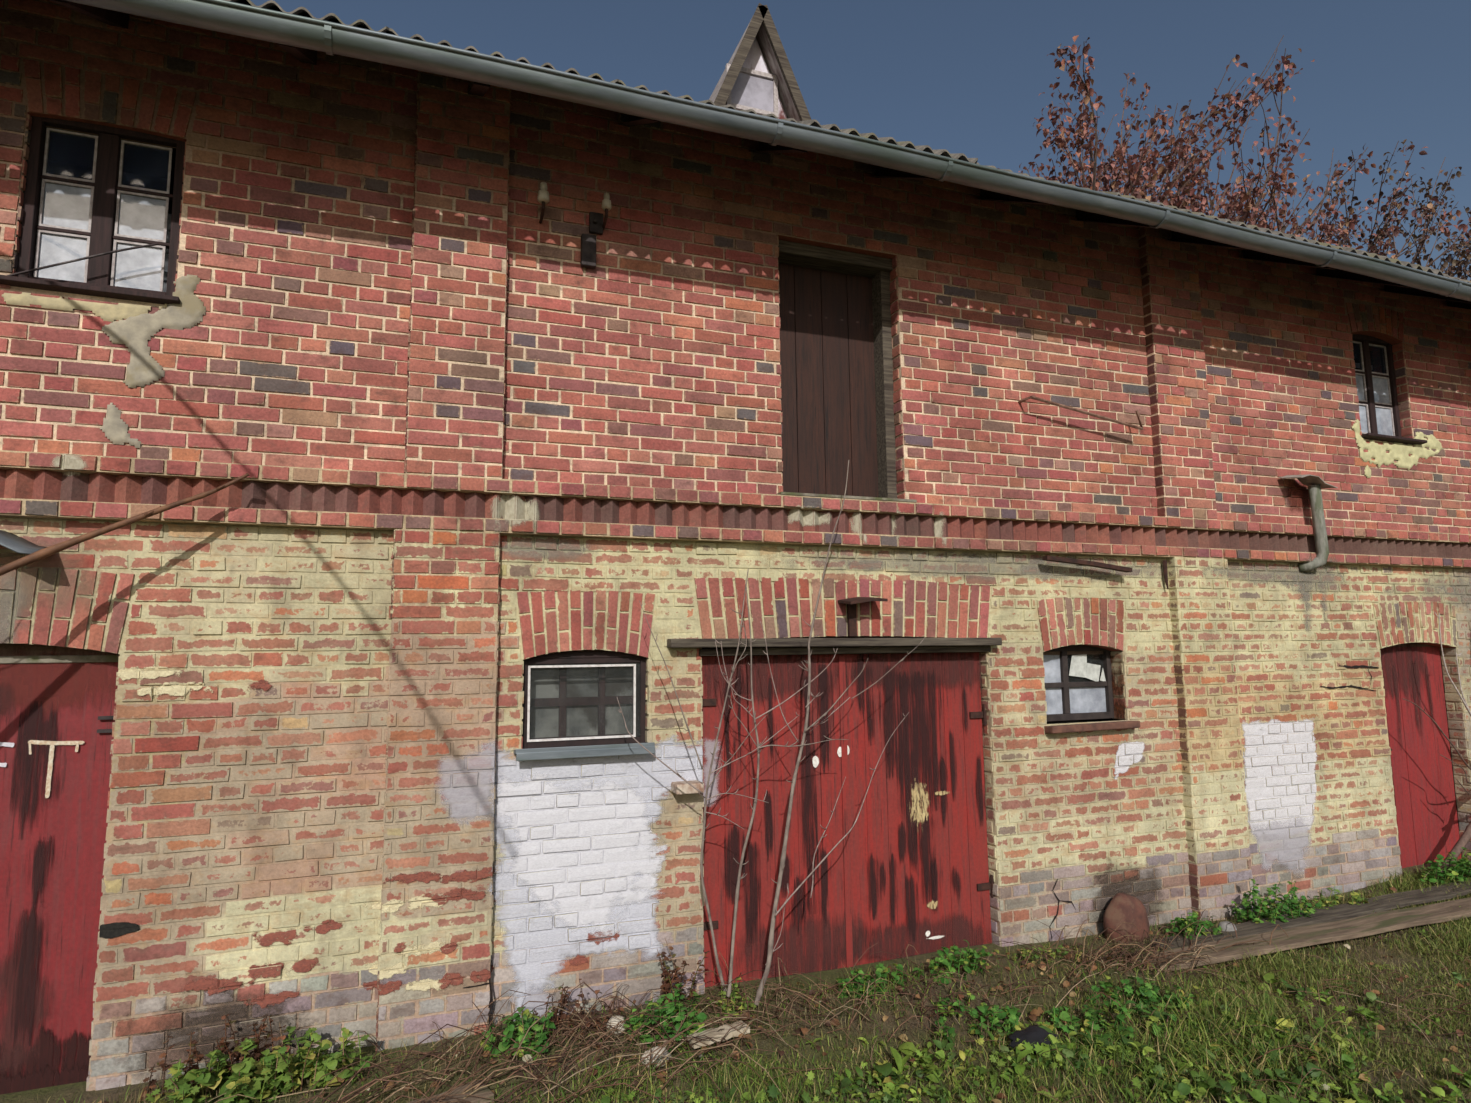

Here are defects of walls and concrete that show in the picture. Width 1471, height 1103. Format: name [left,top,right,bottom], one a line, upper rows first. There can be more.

spalling [569,930,620,966]